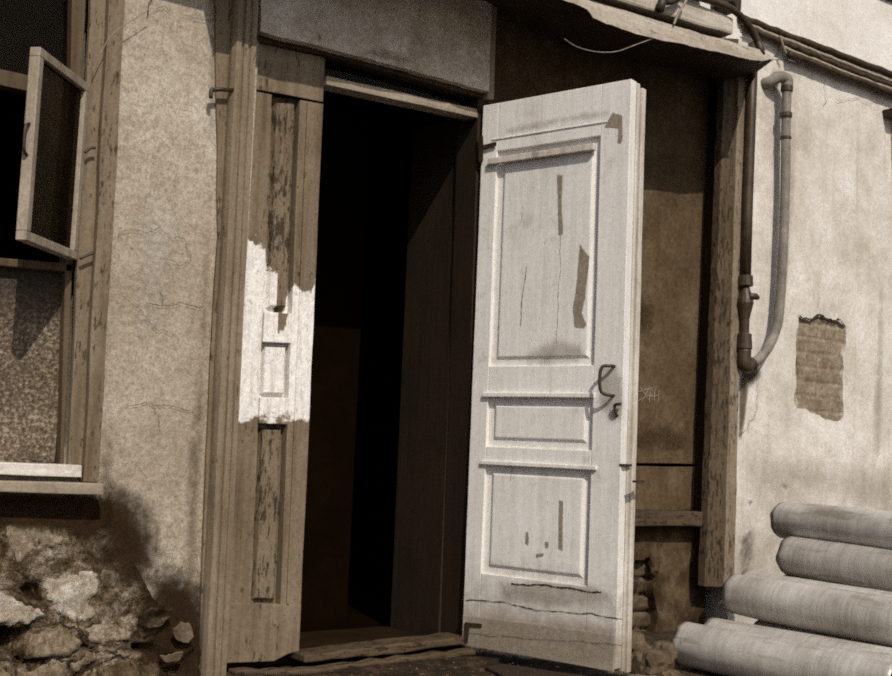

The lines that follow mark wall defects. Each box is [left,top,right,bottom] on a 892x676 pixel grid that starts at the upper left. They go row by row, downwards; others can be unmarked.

flaking render [795,314,844,421]
flaking render [0,523,200,676]
leakage [0,490,202,676]
flaking render [632,558,659,632]